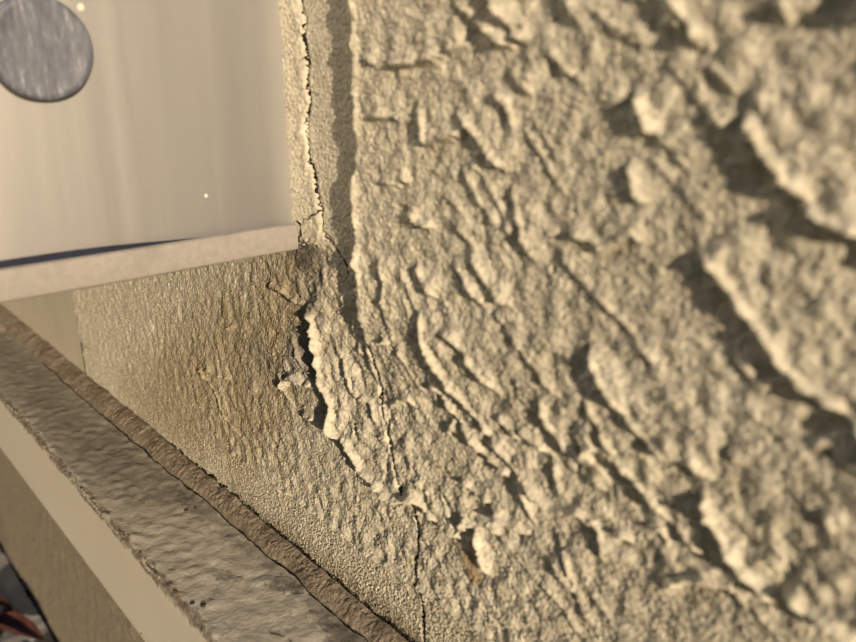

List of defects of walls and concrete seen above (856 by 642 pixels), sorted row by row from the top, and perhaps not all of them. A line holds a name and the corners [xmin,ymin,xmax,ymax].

crack [297,0,355,287]
crack [42,343,425,642]